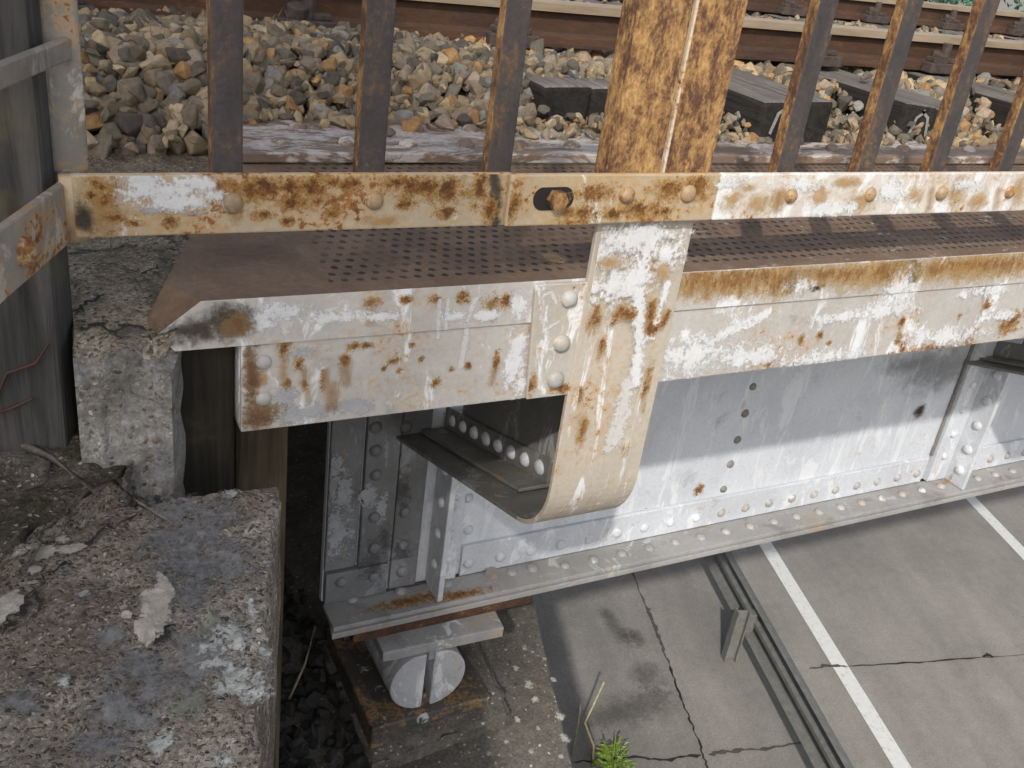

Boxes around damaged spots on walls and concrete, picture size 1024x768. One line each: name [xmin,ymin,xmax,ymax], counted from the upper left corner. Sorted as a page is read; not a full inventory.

rust [224,175,363,227]
rust [365,174,522,226]
rust [553,175,714,226]
rust [809,177,872,214]
crack [73,295,152,341]
rust [456,290,513,311]
rust [585,298,673,359]
rust [994,308,1022,338]
rust [220,313,288,431]
rust [277,342,326,391]
rust [528,375,590,450]
spalling [118,571,177,648]